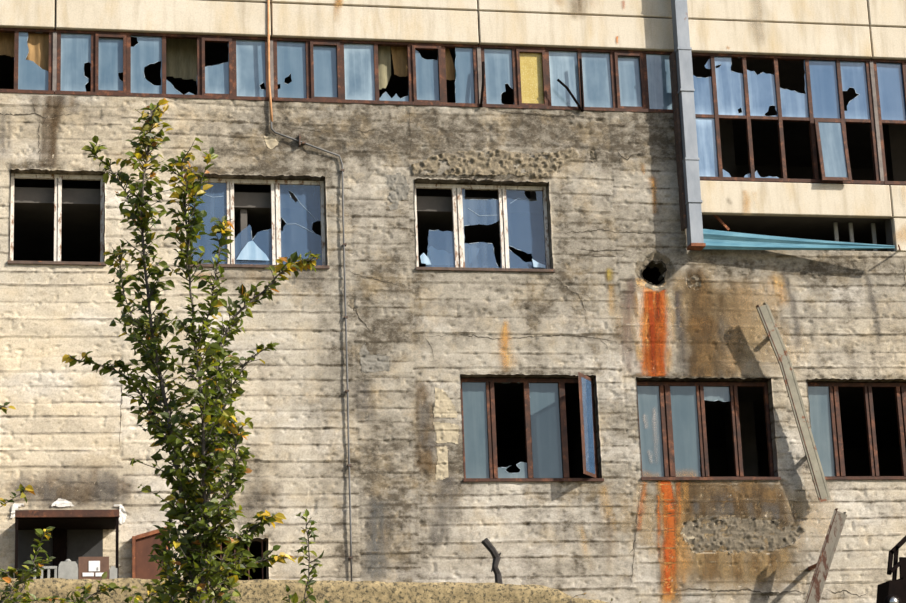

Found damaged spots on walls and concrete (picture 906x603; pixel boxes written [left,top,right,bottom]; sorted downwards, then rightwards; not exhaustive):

water stain [41,96,74,166]
spalling [635,250,675,292]
crack [425,279,636,358]
rust [637,281,669,377]
water stain [675,269,751,376]
rust [657,480,681,603]
spalling [681,517,804,554]